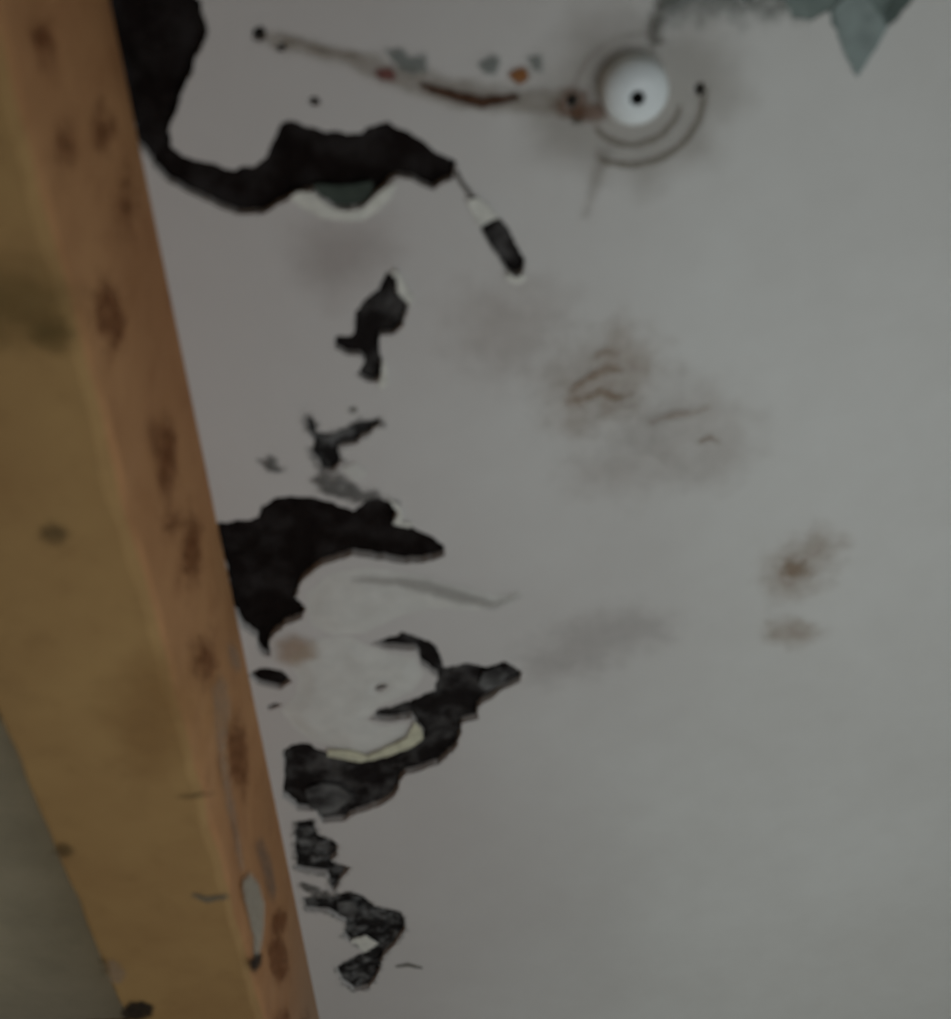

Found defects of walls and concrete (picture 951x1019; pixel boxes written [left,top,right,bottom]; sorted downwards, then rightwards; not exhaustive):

spalling [109,0,456,221]
rust [376,49,541,108]
peeling [709,0,911,77]
spalling [467,197,526,284]
spalling [335,270,414,390]
spalling [217,416,444,651]
spalling [252,668,290,685]
spalling [283,631,520,991]